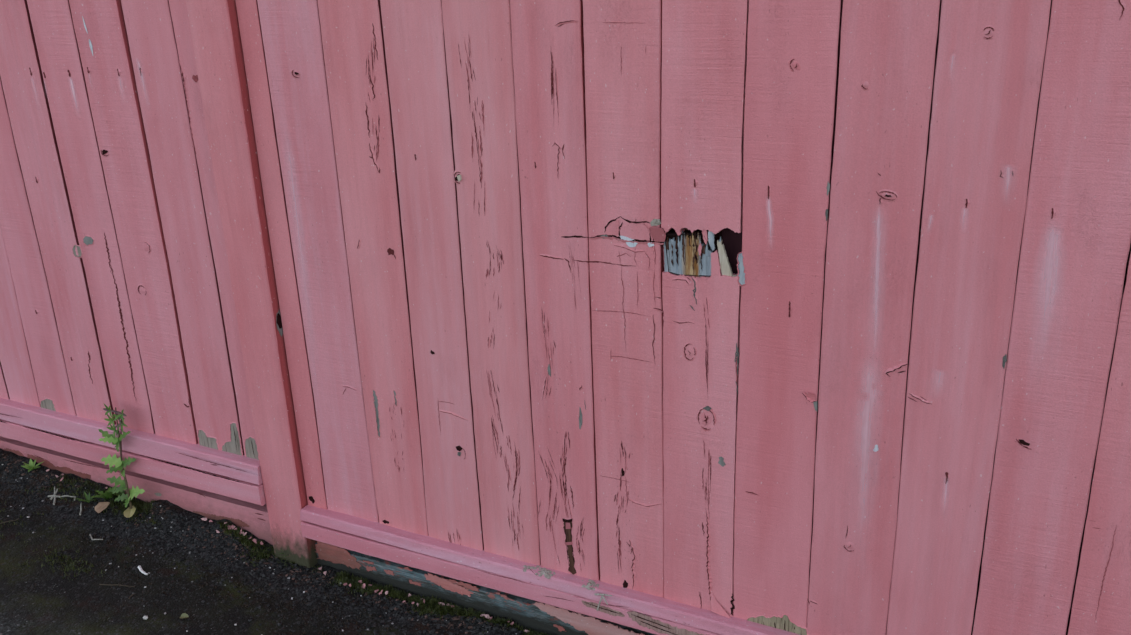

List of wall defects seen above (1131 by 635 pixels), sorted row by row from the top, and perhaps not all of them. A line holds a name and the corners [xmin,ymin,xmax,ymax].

crack [1118,0,1127,21]
crack [365,23,381,173]
spalling [601,219,747,287]
crack [438,20,586,601]
crack [733,344,741,393]
peeling [197,422,259,460]
crack [540,244,715,623]
peeling [315,541,480,597]
peeling [495,592,707,635]
peeling [711,592,808,635]